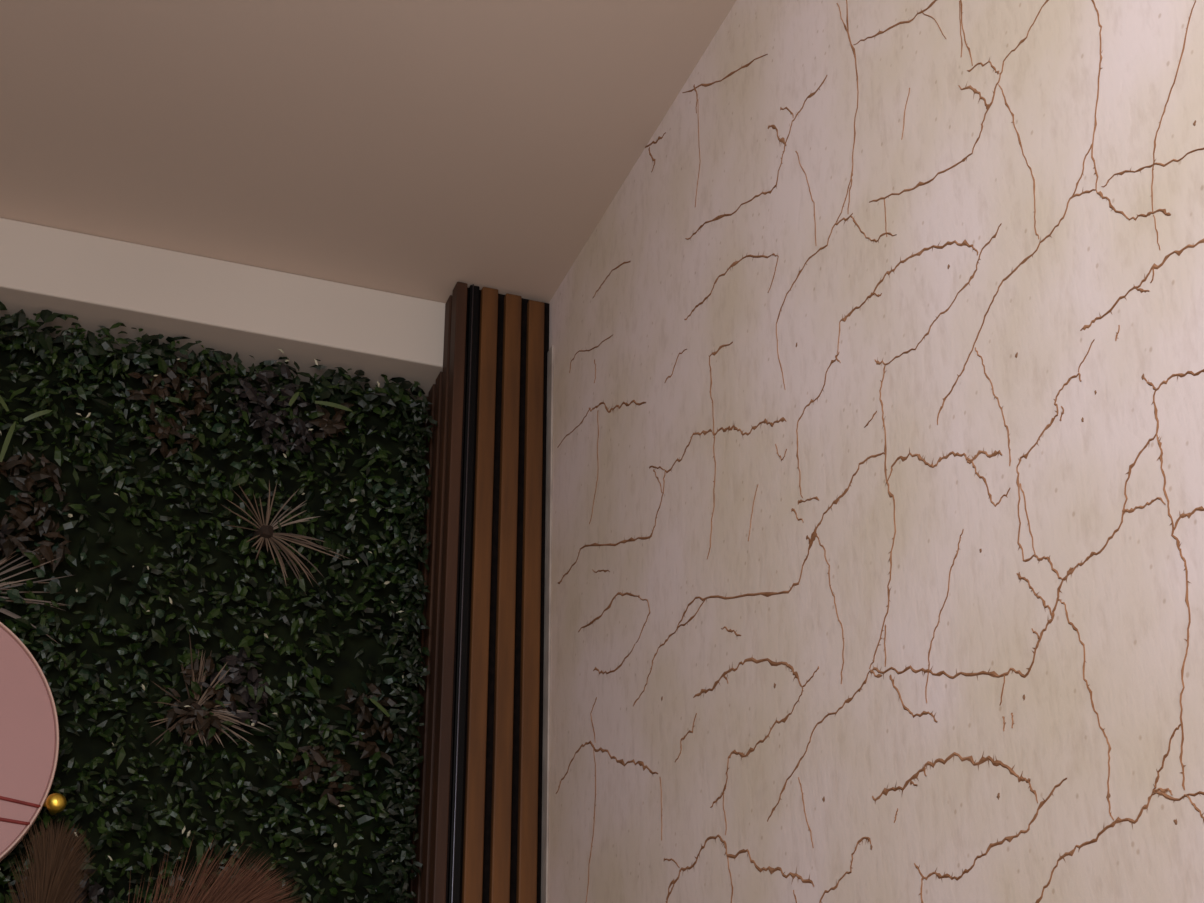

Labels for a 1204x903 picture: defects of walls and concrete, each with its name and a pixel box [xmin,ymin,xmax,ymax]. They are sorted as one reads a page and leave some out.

crack [556,0,1204,903]